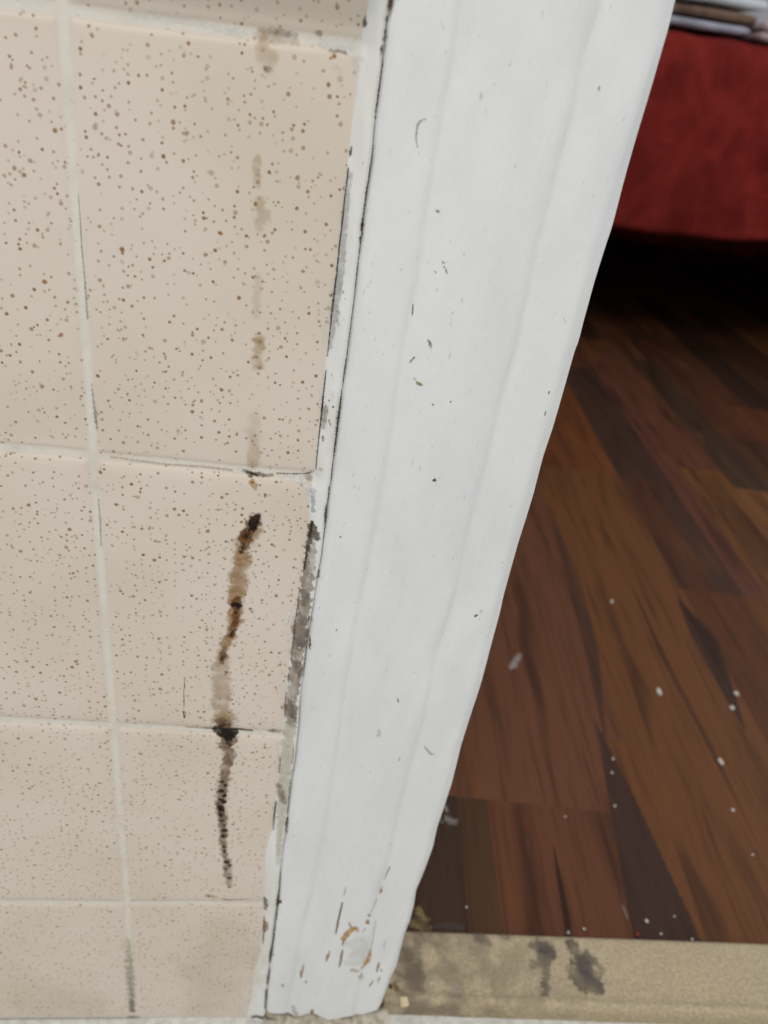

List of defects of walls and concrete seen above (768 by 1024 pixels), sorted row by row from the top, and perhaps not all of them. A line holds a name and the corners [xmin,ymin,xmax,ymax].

rust [217,514,261,664]
peeling [339,922,359,968]
water stain [536,938,605,994]